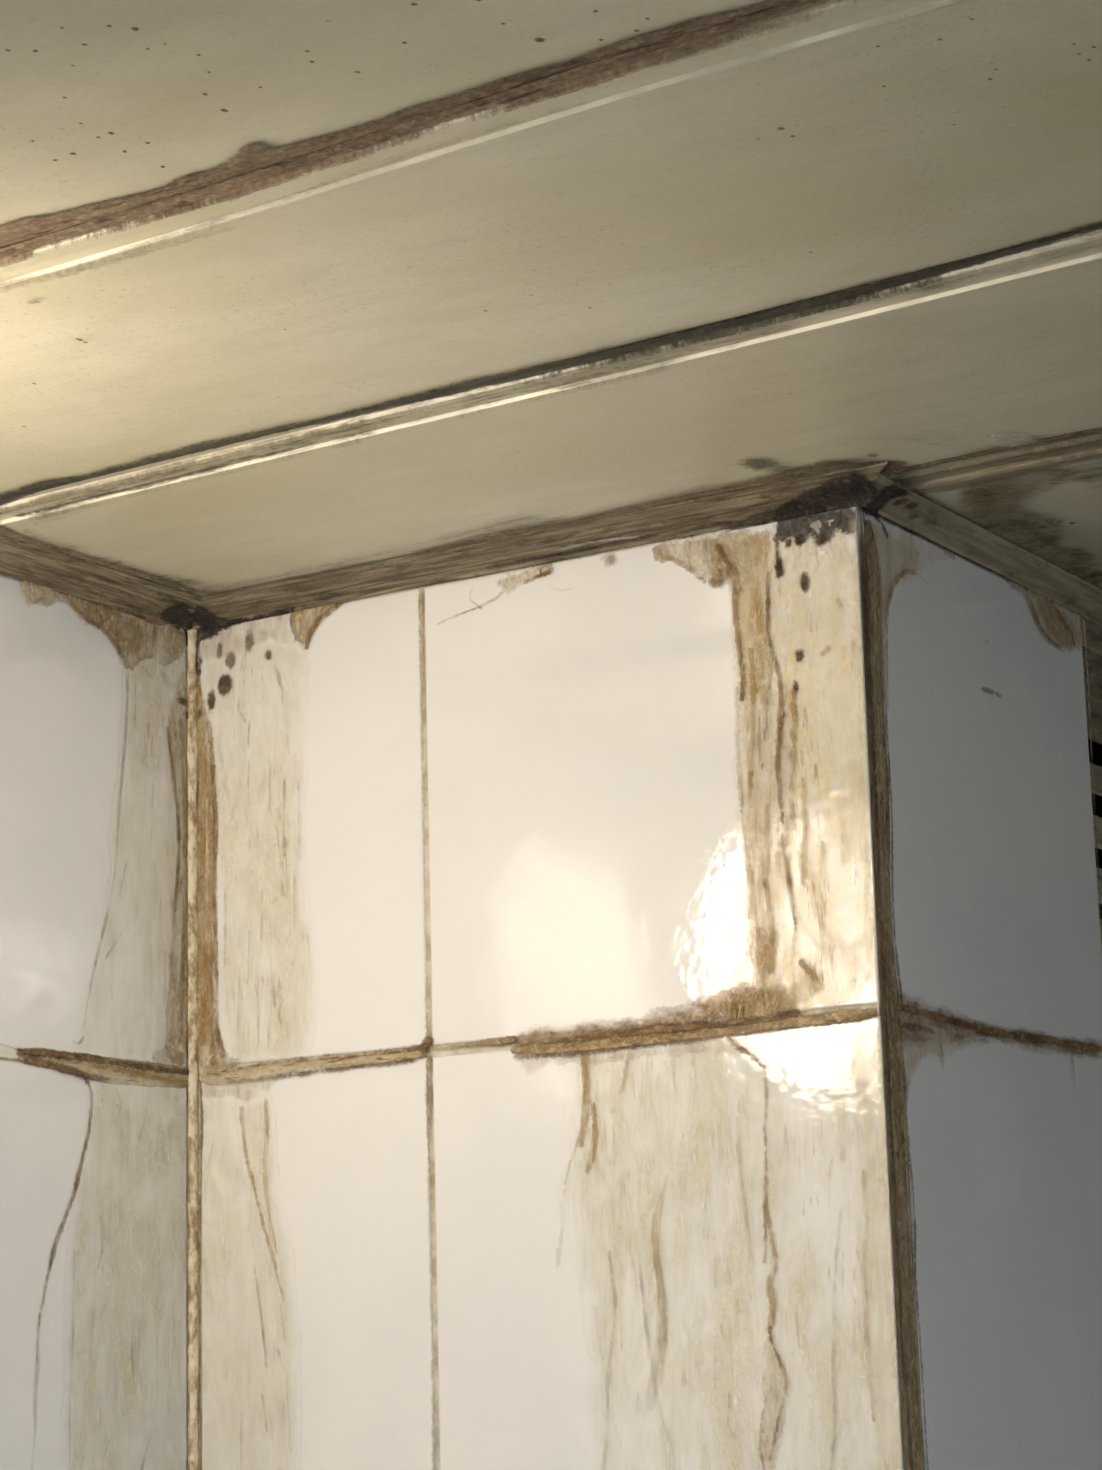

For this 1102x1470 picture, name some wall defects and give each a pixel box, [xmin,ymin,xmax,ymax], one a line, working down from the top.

damp [0,223,1102,517]
damp [161,602,295,718]
damp [489,517,714,569]
damp [580,1055,598,1162]
damp [729,454,929,1470]
damp [17,1048,203,1470]